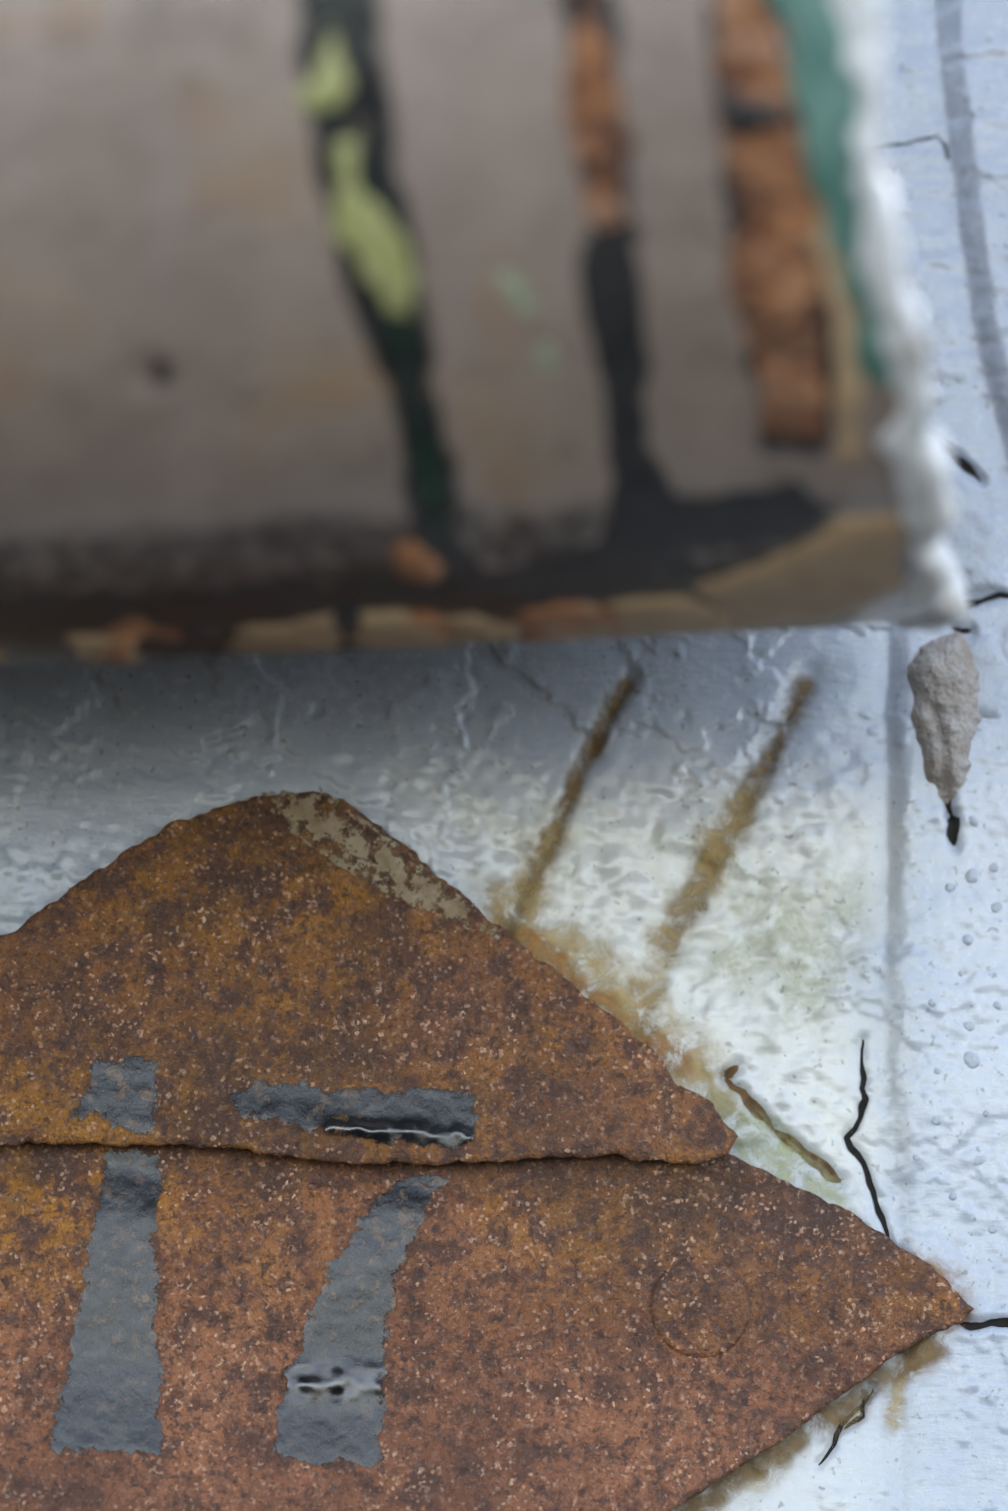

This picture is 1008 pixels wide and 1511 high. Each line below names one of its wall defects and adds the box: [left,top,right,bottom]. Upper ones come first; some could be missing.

crack [949,449,981,481]
corrosion [695,512,907,631]
crack [953,592,1008,633]
corrosion [489,678,814,1118]
crack [725,1039,890,1238]
corrosion [678,1337,944,1511]